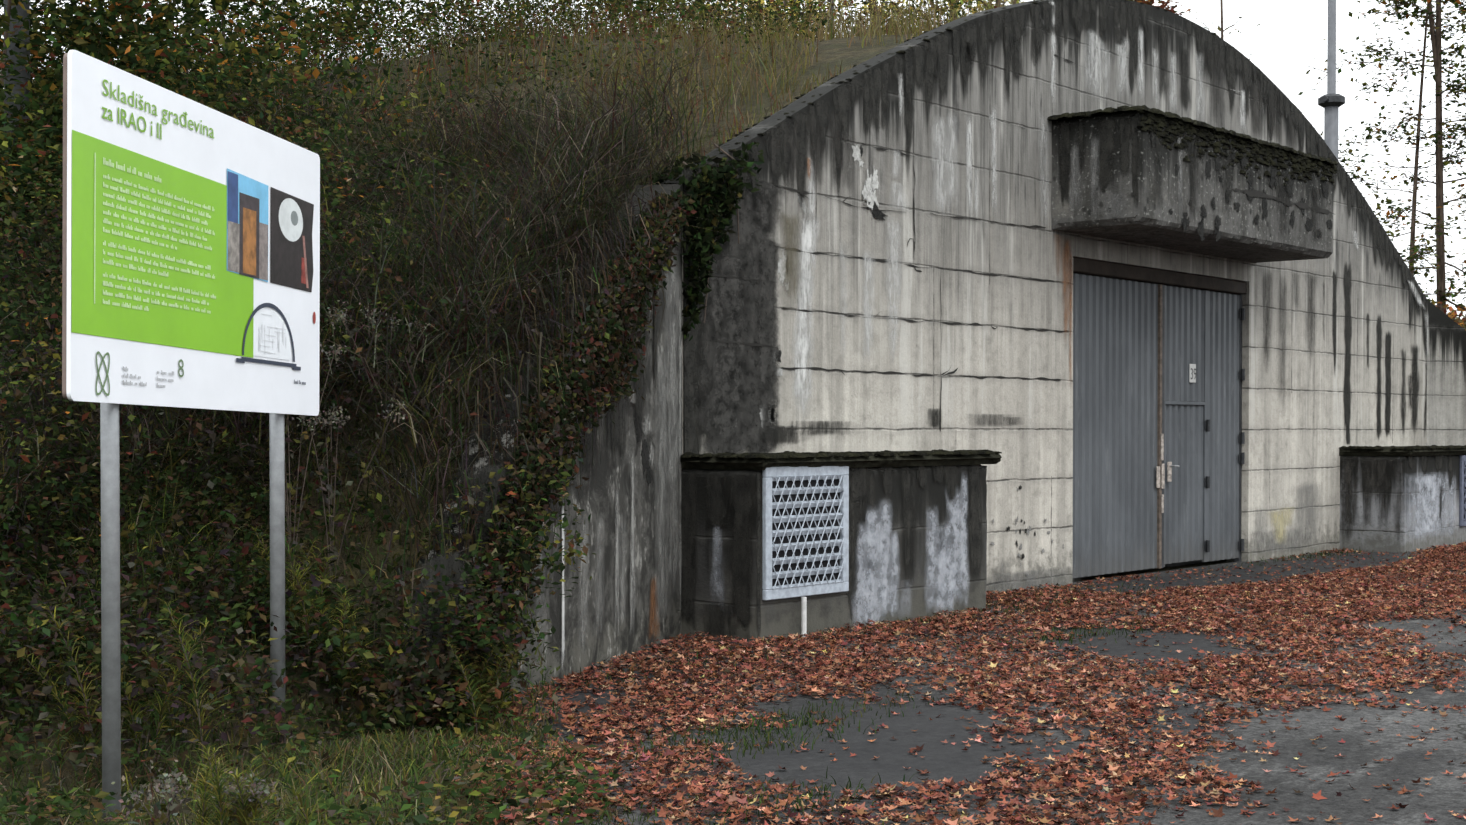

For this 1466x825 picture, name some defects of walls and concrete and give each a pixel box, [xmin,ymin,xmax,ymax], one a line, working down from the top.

damp [1004,2,1056,94]
damp [882,79,912,128]
damp [937,120,977,206]
damp [1059,116,1200,214]
damp [545,118,849,656]
damp [1333,263,1453,535]
damp [848,465,982,624]